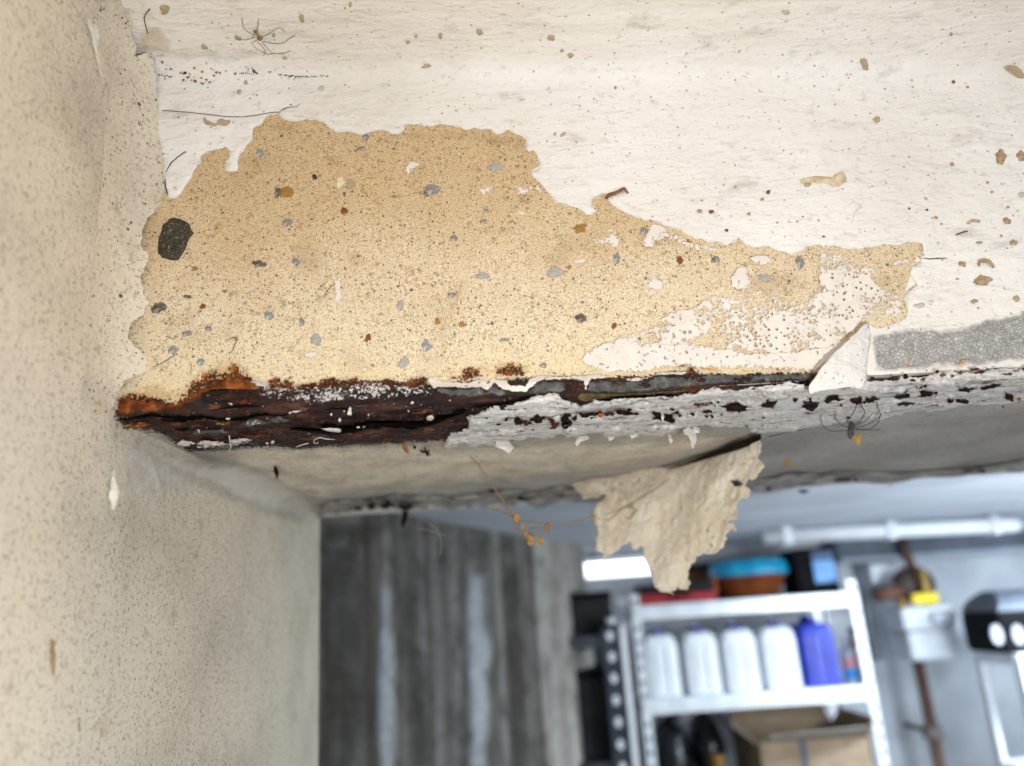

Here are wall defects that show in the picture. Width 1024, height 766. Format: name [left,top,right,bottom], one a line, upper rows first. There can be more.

corrosion [115,363,817,453]
peeling [117,113,1024,595]